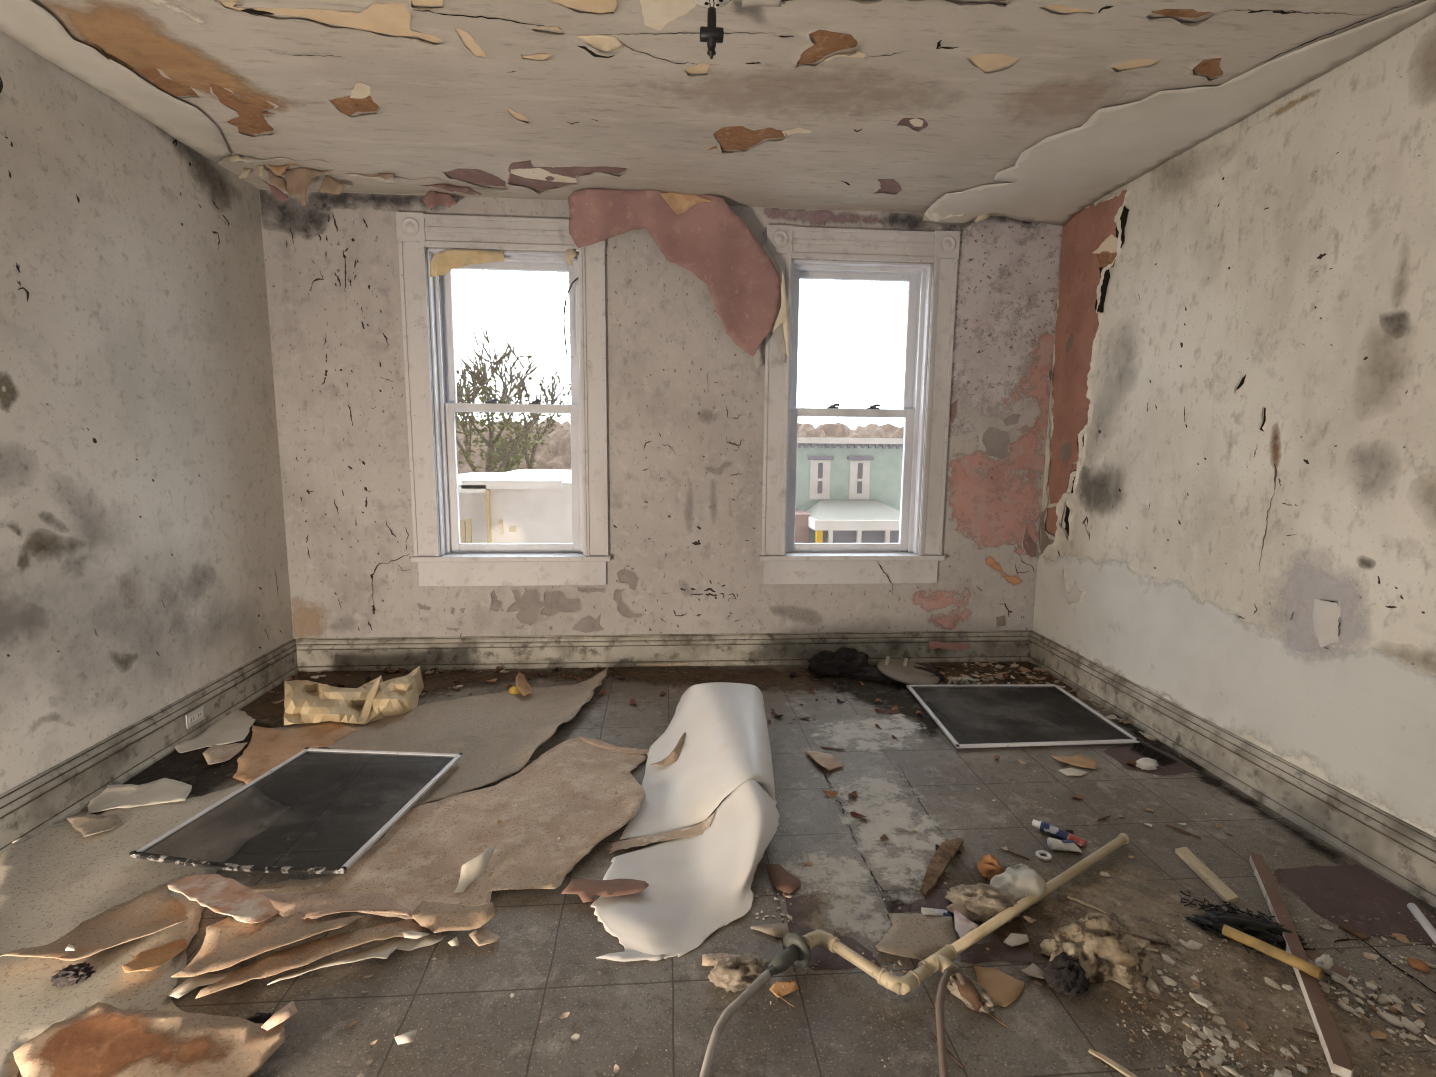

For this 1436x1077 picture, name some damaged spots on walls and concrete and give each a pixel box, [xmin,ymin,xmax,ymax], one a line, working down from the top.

peeling [209,0,495,60]
crack [417,10,544,26]
peeling [514,0,696,62]
peeling [786,22,869,69]
peeling [133,67,286,138]
peeling [706,122,811,153]
mould [180,142,226,193]
peeling [436,157,633,194]
damp [0,376,16,410]
peeling [1021,182,1133,561]
damp [9,526,74,569]
damp [1284,565,1361,651]